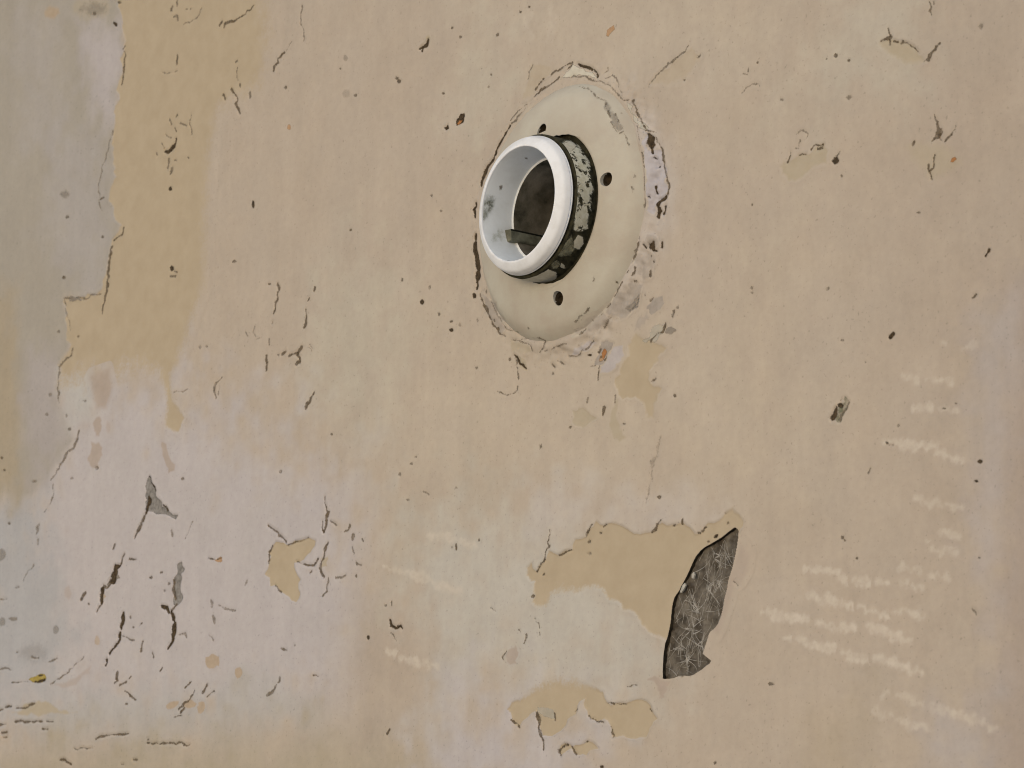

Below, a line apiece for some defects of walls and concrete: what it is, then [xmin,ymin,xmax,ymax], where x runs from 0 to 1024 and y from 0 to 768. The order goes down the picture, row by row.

peeling [521,140,593,283]
damp [85,361,117,472]
spalling [830,397,850,421]
damp [896,367,962,420]
spalling [145,476,178,519]
crack [0,512,163,705]
peeling [263,536,330,603]
crack [268,504,364,597]
peeling [524,505,757,679]
damp [756,523,1003,739]
crack [60,682,215,765]
peeling [506,666,658,757]